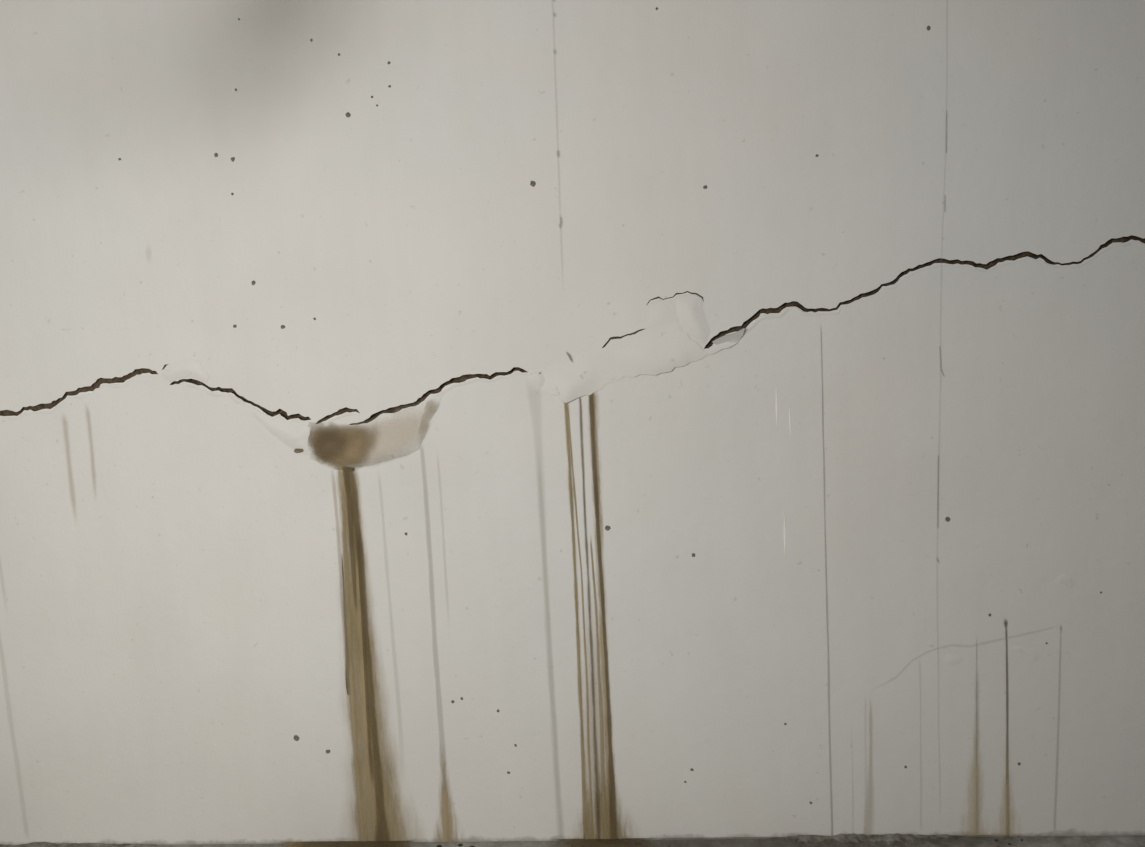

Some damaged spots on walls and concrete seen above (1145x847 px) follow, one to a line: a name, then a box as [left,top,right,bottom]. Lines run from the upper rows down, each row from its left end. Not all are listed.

crack [0,364,528,427]
peeling [528,295,745,403]
crack [646,291,704,308]
crack [704,235,1145,349]